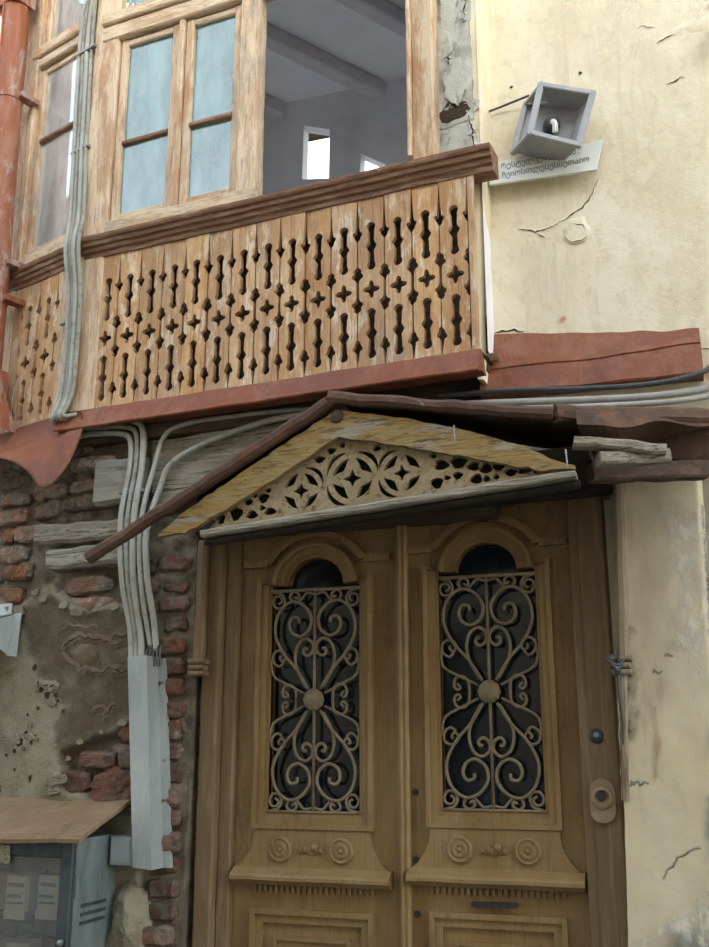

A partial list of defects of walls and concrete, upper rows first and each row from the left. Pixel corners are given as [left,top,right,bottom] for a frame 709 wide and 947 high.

flaking render [437,0,481,153]
crack [517,179,600,239]
spalling [0,446,122,617]
crack [701,504,709,633]
spalling [5,680,61,757]
spalling [54,719,131,813]
spalling [129,556,197,947]
crack [662,846,701,880]
water stain [670,905,709,947]